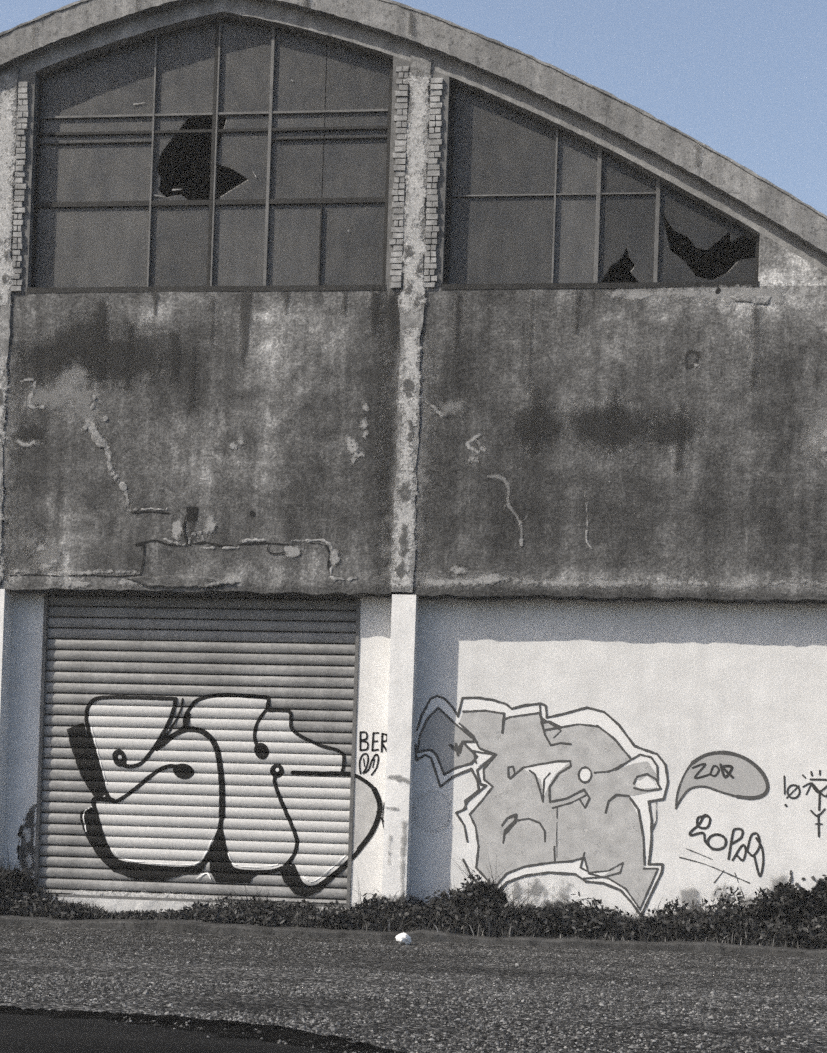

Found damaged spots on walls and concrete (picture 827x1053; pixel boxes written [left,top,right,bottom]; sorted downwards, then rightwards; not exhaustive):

water stain [578,406,640,443]
crack [488,475,527,546]